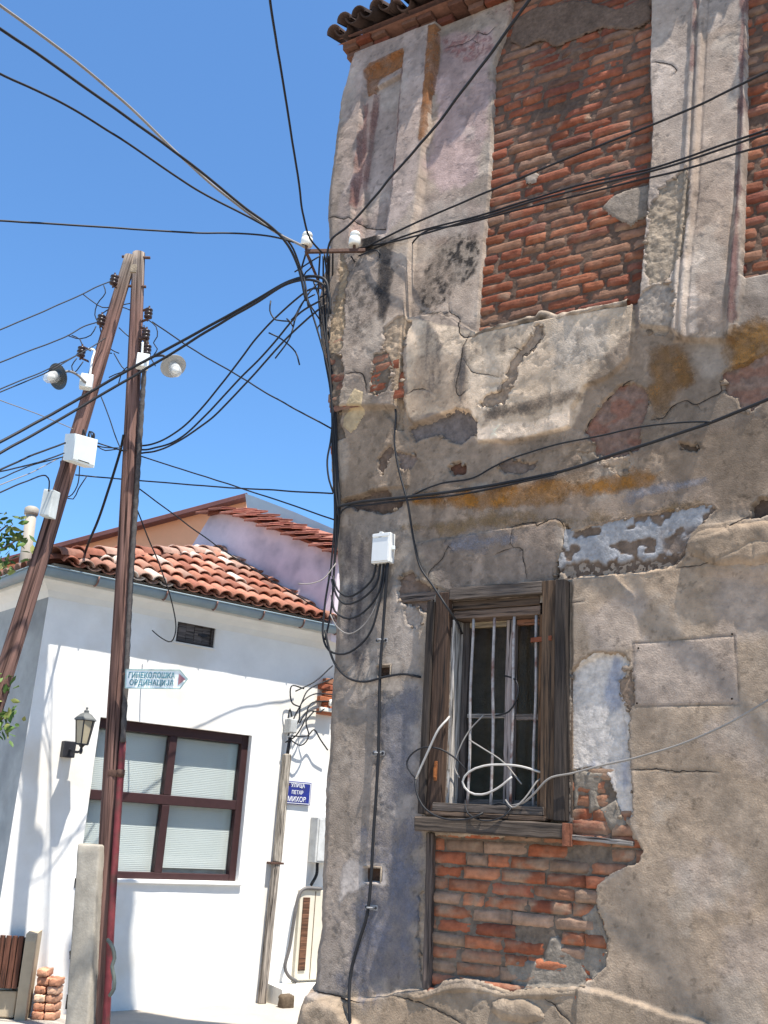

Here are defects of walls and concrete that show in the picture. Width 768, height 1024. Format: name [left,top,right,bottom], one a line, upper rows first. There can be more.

spalling [369,316,478,475]
crack [429,310,499,396]
spalling [576,383,651,476]
crack [498,518,565,579]
peeling [553,505,715,579]
flaking render [417,652,643,999]